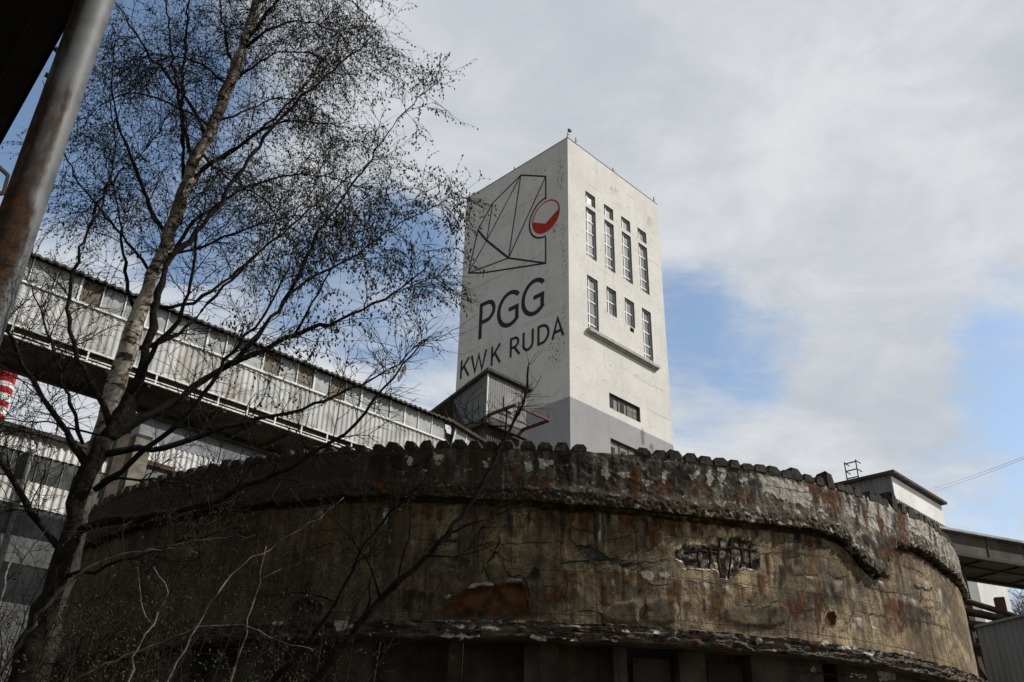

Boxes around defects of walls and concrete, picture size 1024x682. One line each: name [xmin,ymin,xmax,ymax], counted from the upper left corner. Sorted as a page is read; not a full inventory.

peeling [689,467,727,488]
peeling [739,473,830,512]
rust [809,484,842,513]
peeling [843,492,942,550]
spalling [673,535,761,580]
spalling [440,567,541,640]
spalling [820,612,885,657]